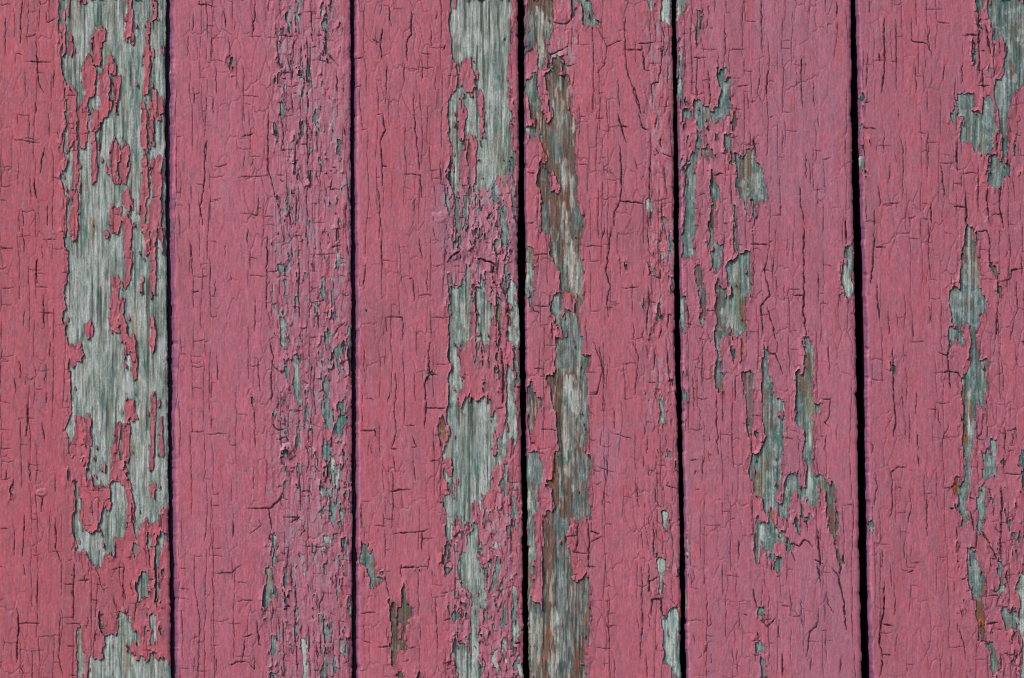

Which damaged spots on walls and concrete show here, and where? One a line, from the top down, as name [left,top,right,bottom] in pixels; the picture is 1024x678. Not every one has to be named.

crack [1,0,136,676]
peeling [58,0,172,678]
crack [187,1,452,677]
peeling [387,583,412,678]
peeling [437,0,593,678]
crack [551,18,736,675]
peeling [644,37,845,573]
crack [752,163,807,374]
crack [744,520,847,675]
crack [863,128,1023,677]
peeling [946,224,1024,678]
peeling [950,0,1024,189]